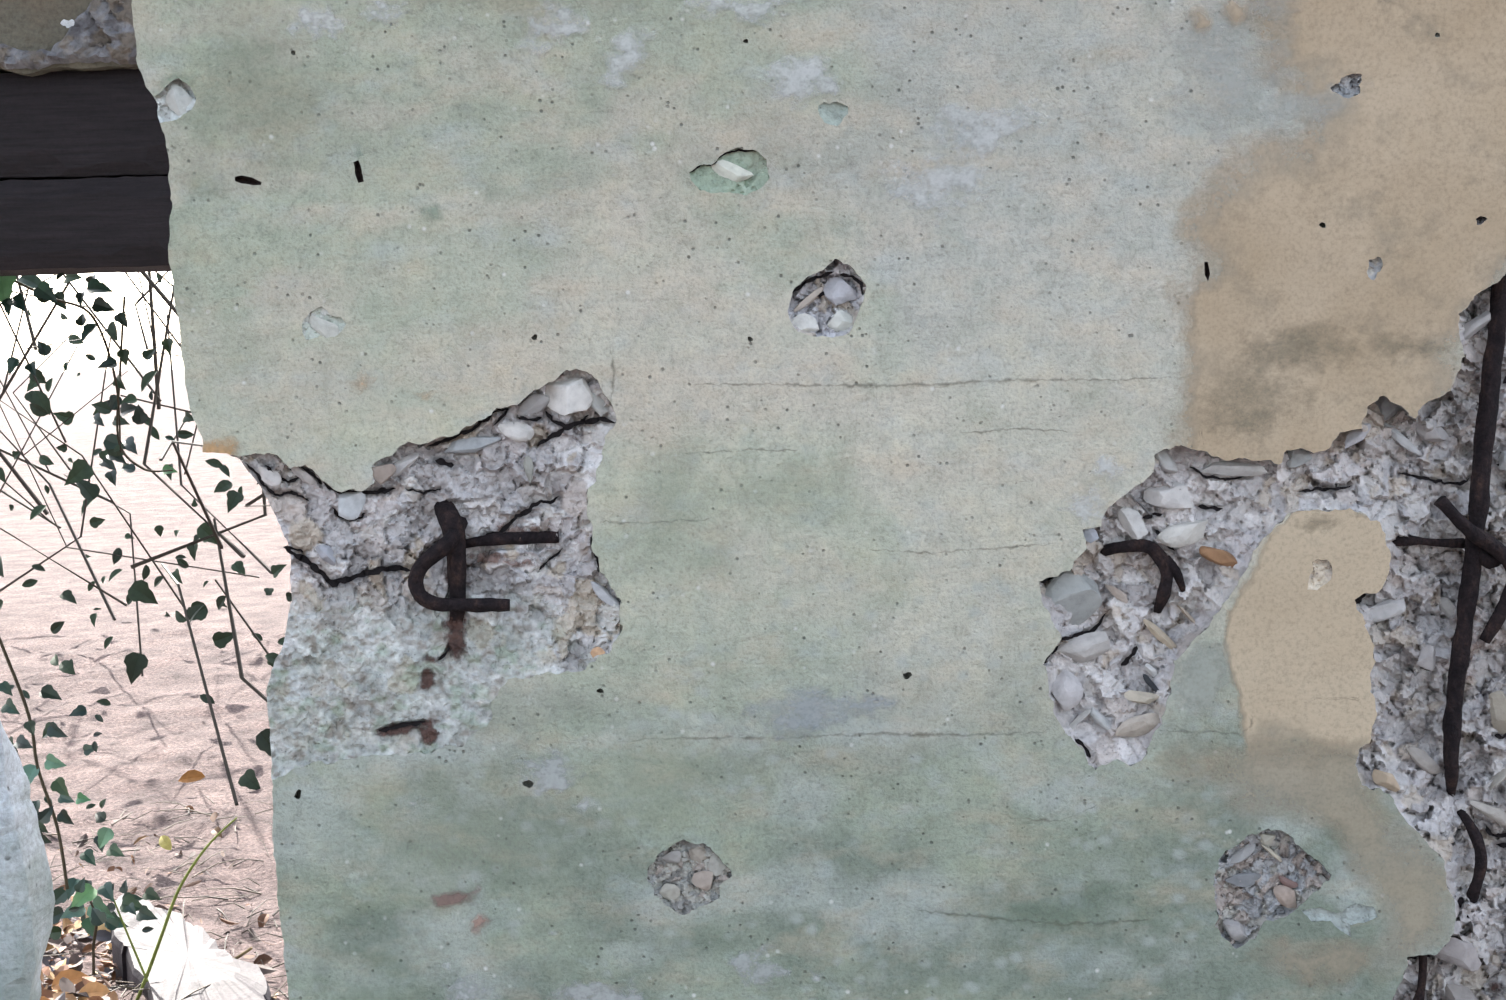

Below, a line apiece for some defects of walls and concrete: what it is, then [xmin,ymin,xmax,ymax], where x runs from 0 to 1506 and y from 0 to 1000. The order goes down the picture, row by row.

peeling [689,147,769,196]
spalling [788,259,866,338]
leakage [1183,0,1506,465]
peeling [1367,257,1383,280]
spalling [230,369,622,780]
spalling [646,840,732,915]
spalling [1039,286,1506,1000]
leakage [1181,508,1447,949]